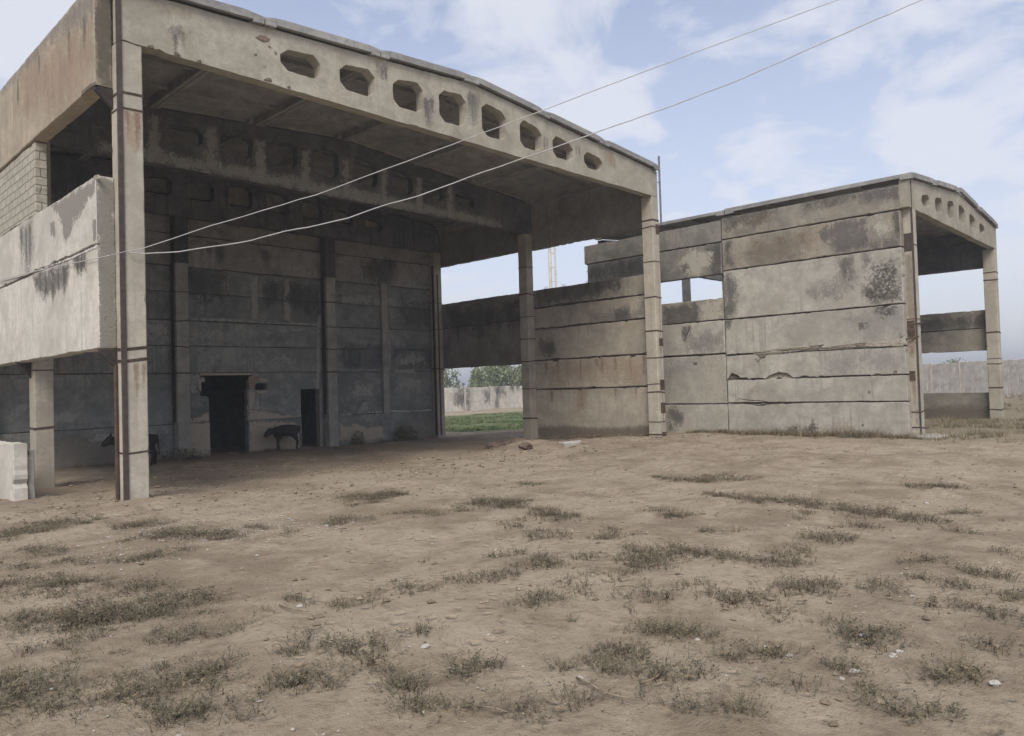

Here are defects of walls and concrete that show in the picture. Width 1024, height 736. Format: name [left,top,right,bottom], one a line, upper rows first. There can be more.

damp [819,211,900,252]
damp [34,254,85,297]
damp [865,261,901,315]
spalling [737,338,907,358]